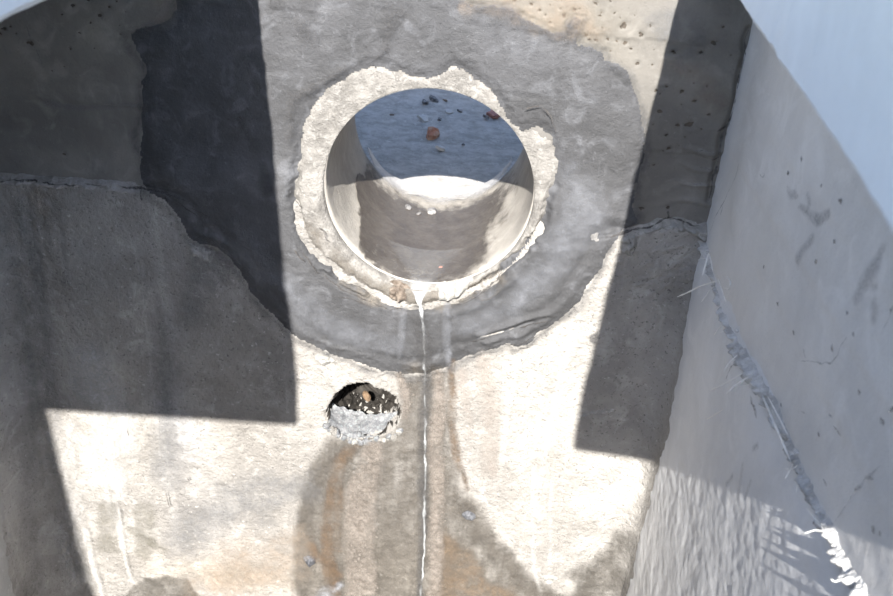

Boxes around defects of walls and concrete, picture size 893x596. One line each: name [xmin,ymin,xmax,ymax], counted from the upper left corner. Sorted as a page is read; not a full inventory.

crack [0,179,100,187]
spalling [322,371,415,596]
water stain [296,366,552,596]
water stain [129,577,198,596]
water stain [573,536,628,596]